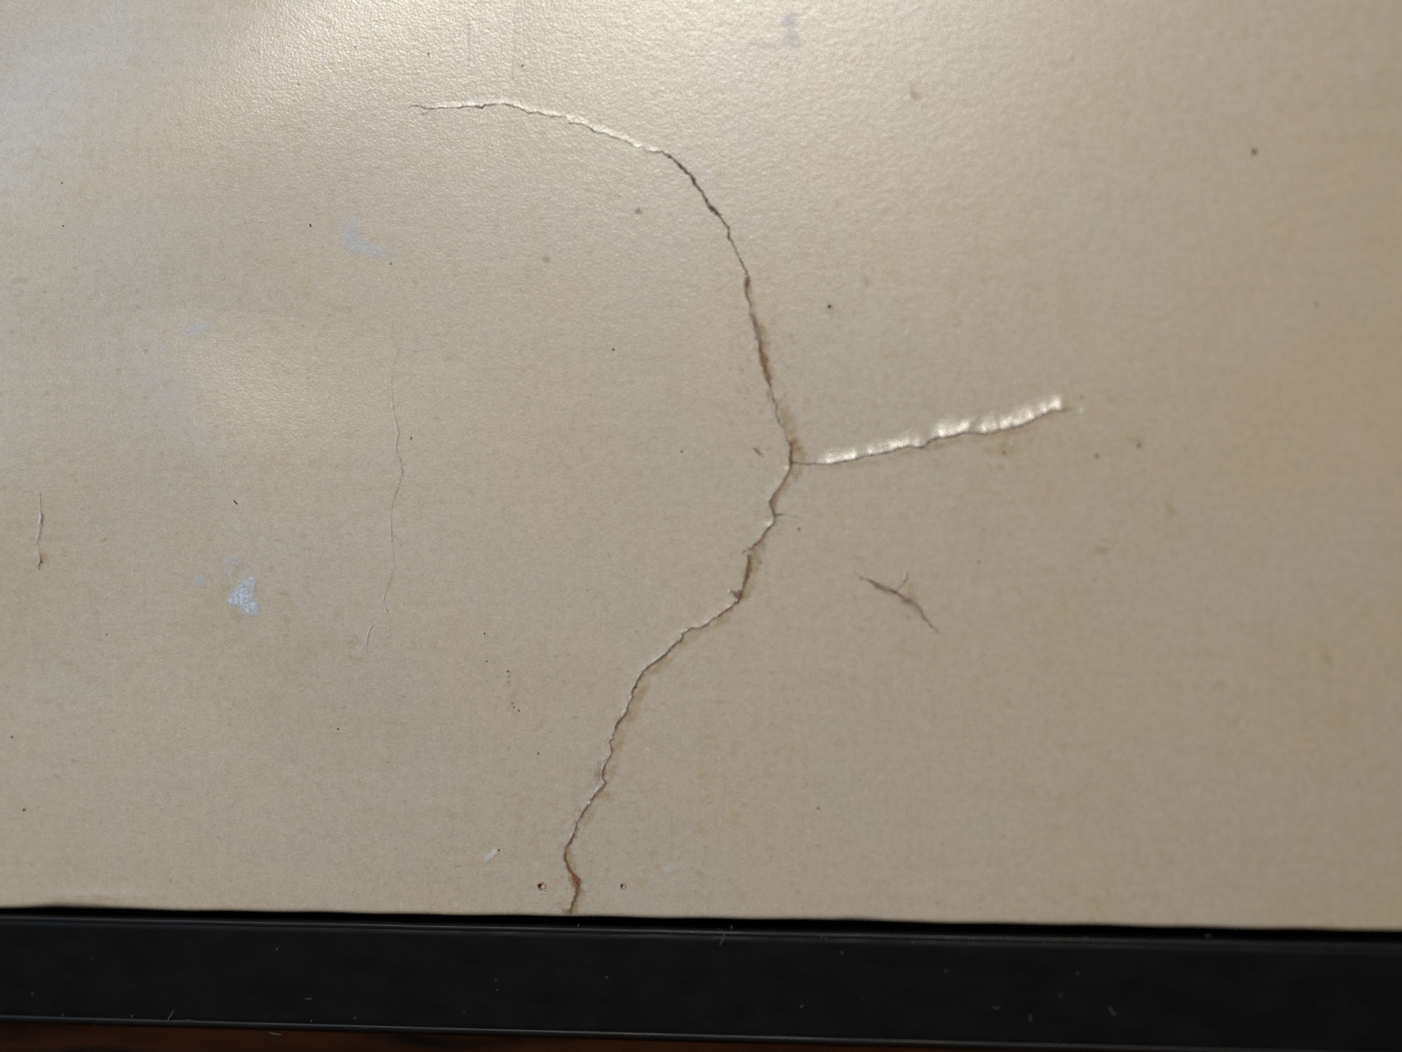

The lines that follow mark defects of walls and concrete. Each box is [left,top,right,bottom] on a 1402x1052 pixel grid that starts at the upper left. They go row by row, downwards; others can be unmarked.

crack [411,97,1071,912]